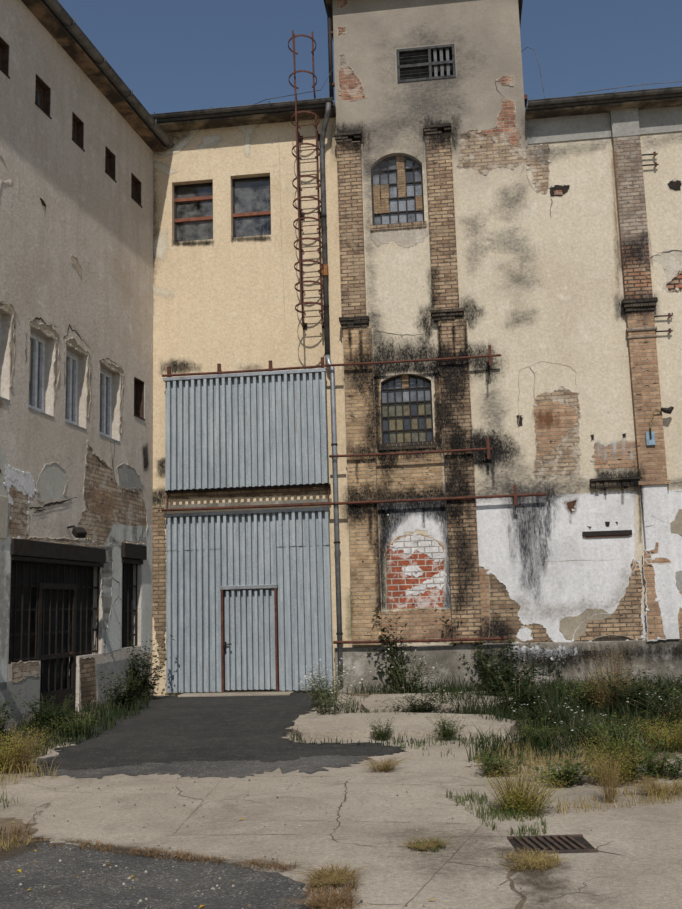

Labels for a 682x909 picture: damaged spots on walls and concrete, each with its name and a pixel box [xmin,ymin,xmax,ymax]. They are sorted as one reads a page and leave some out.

flaking render [457,98,570,197]
crack [0,303,125,486]
leakage [444,453,470,497]
flaking render [515,386,638,480]
flaking render [0,440,332,668]
leakage [347,504,390,606]
leakage [452,509,474,611]
leakage [513,488,555,587]
peeling [473,486,672,662]
crack [168,784,305,840]
crack [329,781,372,847]
crack [404,823,527,909]